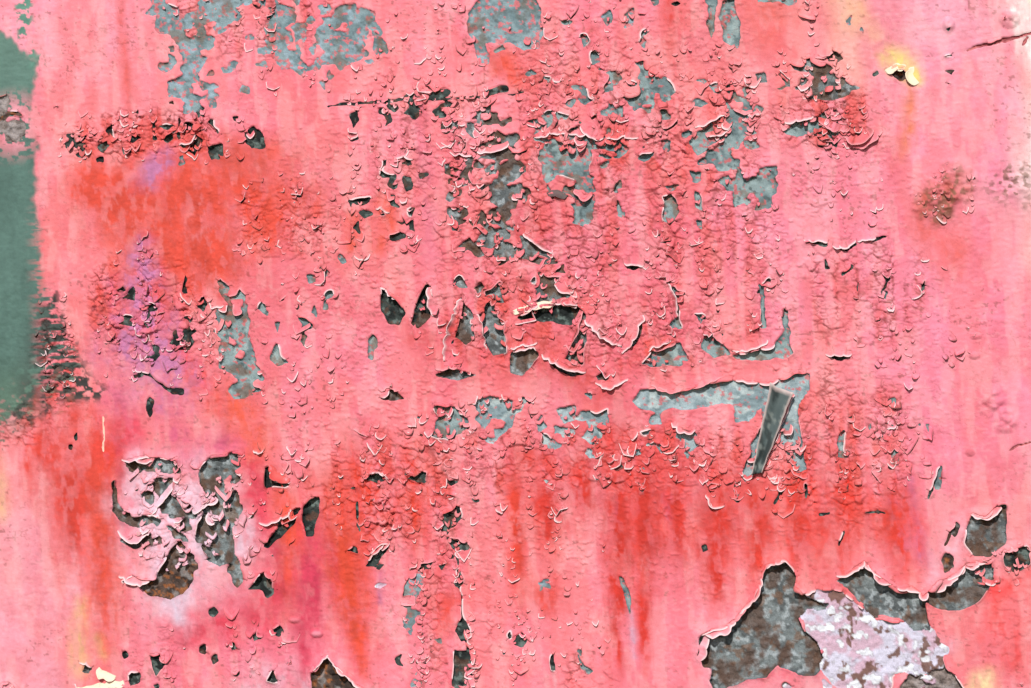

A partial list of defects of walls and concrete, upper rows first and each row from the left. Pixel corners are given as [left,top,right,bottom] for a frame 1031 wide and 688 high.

crack [967,32,1031,51]
rust [471,197,567,265]
peeling [910,256,929,300]
rust [38,0,476,688]
rust [394,301,933,688]
peeling [697,500,1031,688]
peeling [72,646,186,688]